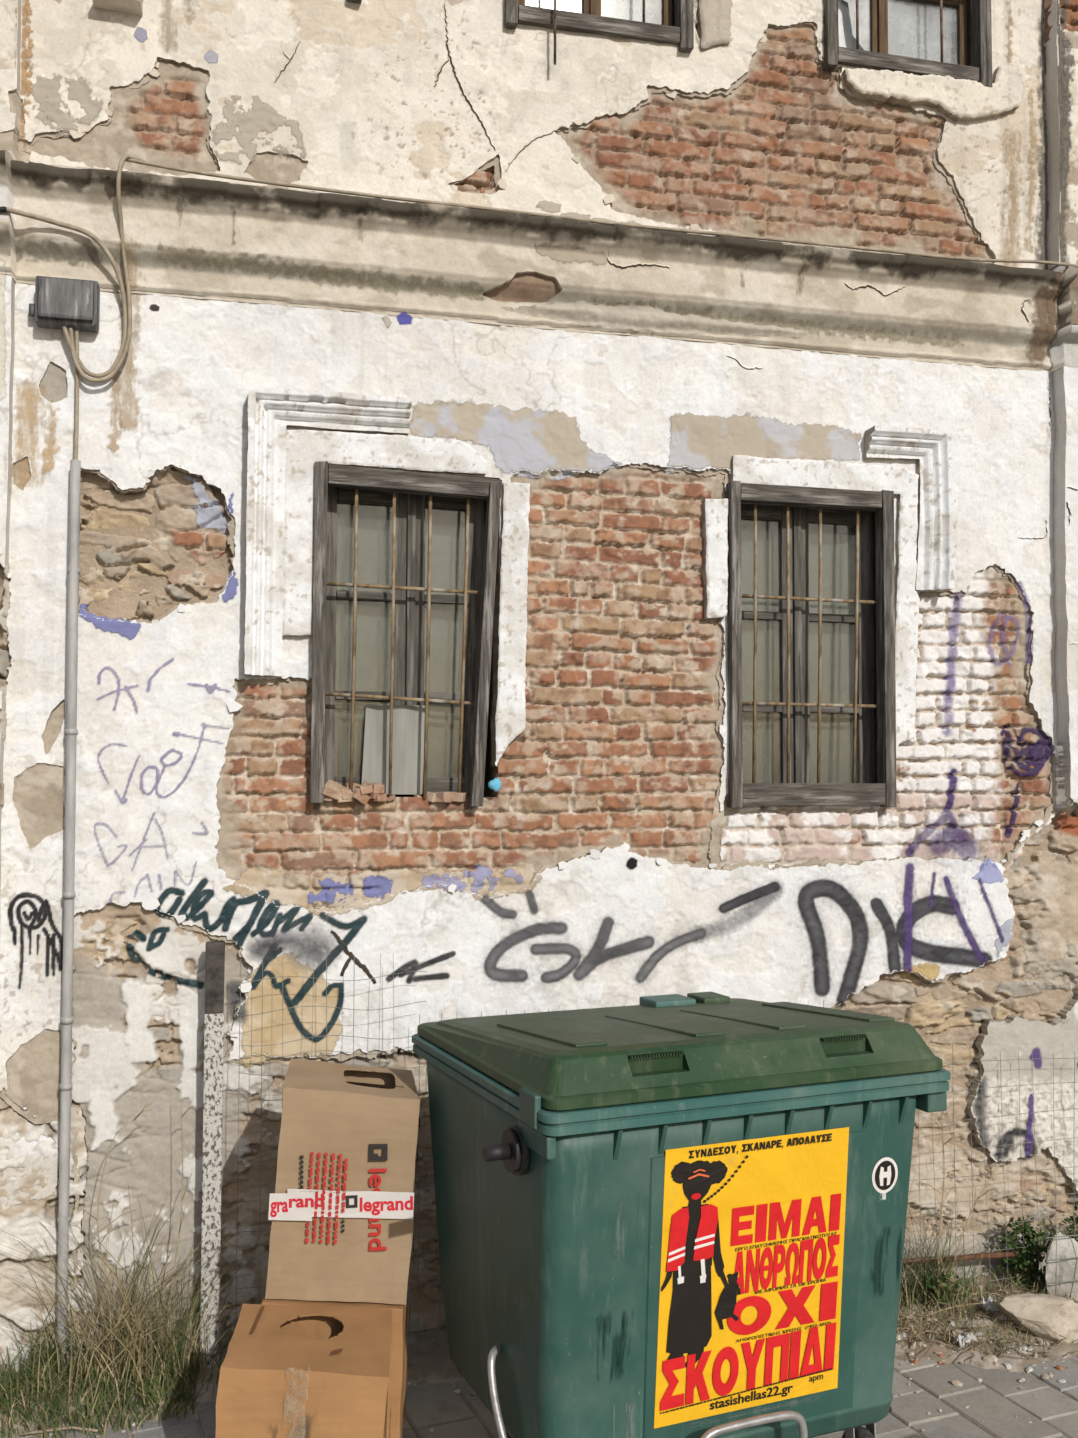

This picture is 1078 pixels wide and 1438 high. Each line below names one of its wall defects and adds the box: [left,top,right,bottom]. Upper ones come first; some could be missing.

peeling [134,27,148,42]
flaking render [0,50,308,199]
crack [433,3,561,171]
flaking render [535,22,1000,265]
flaking render [1044,0,1078,43]
flaking render [483,273,561,303]
flaking render [78,465,238,640]
flaking render [0,551,12,740]
flaking render [215,400,1078,1285]
flaking render [0,900,445,1374]